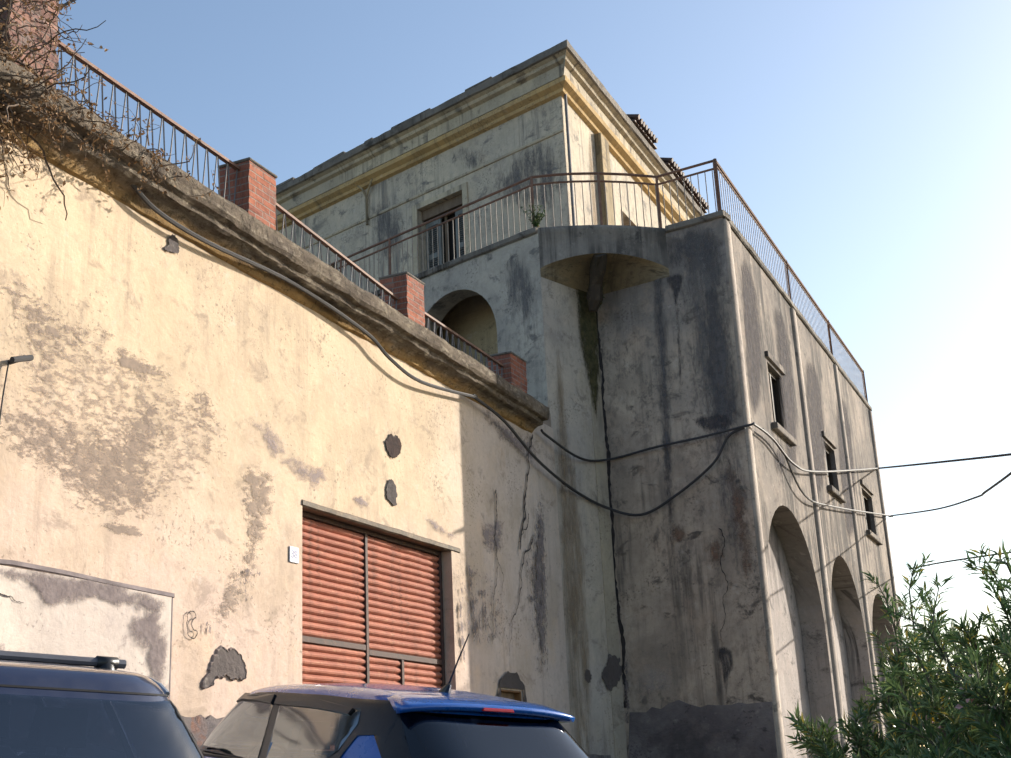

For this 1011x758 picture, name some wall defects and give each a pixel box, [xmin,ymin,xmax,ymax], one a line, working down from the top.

spalling [165,234,180,255]
water stain [577,290,600,412]
water stain [655,232,741,540]
water stain [740,262,763,409]
water stain [774,309,797,480]
water stain [0,569,167,682]
spalling [200,645,247,690]
spalling [386,479,398,506]
crack [492,434,533,652]
spalling [585,654,630,723]
crack [596,311,628,708]
crack [719,528,728,649]